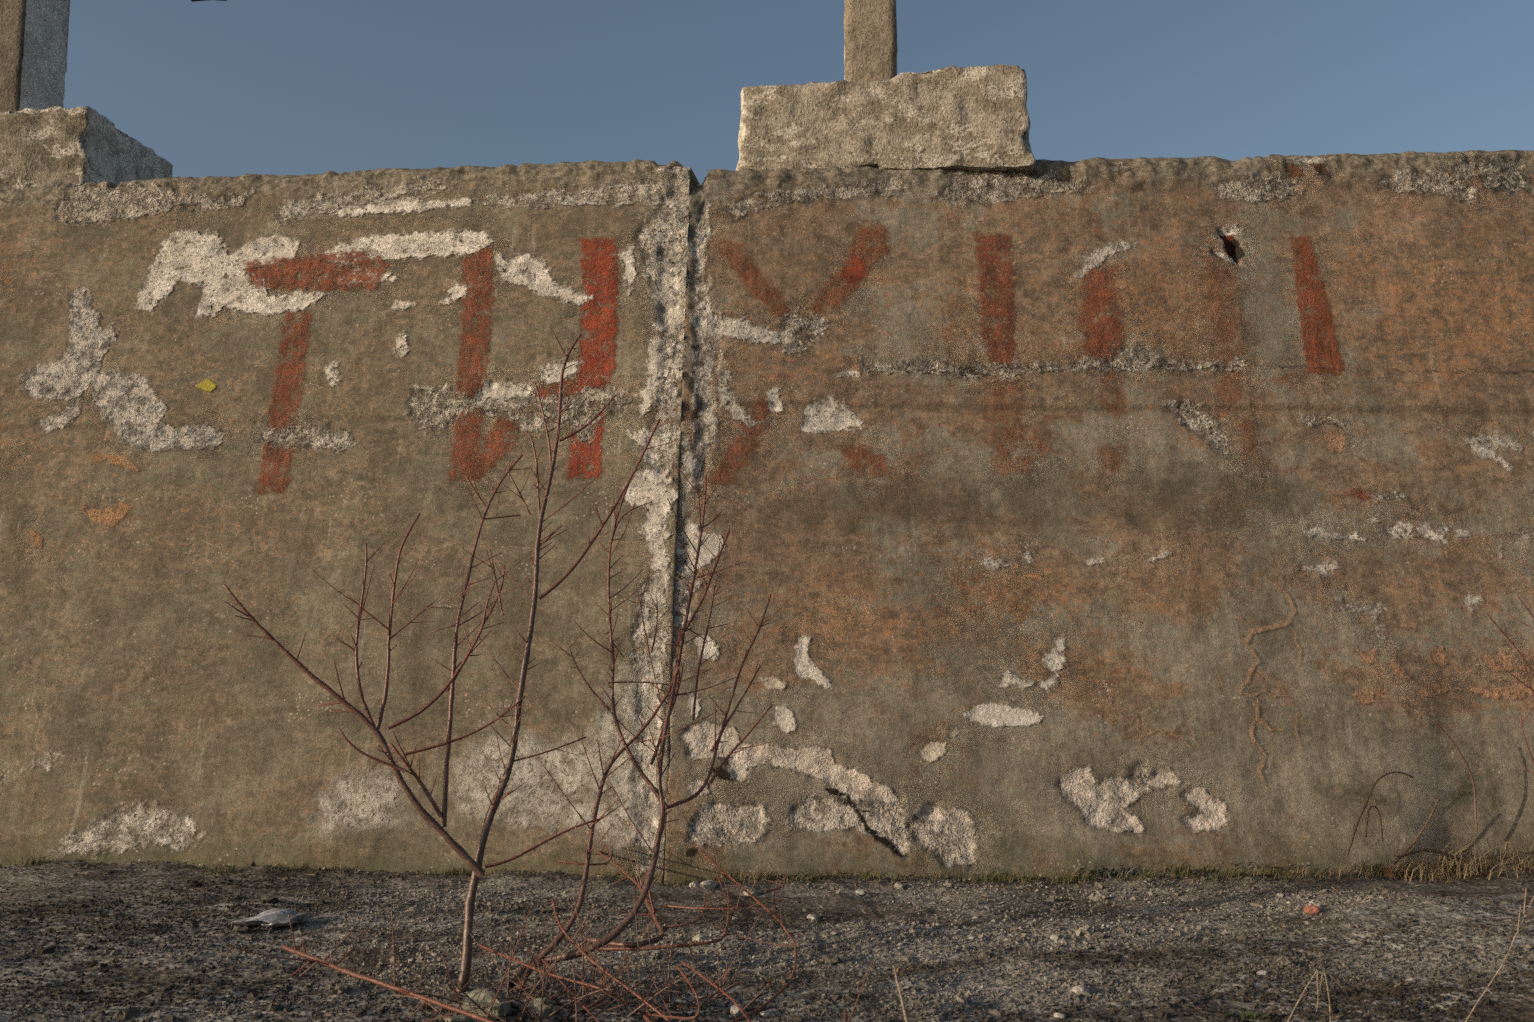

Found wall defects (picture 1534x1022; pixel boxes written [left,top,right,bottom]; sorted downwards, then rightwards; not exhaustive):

spalling [1213,224,1244,264]
crack [824,788,903,858]